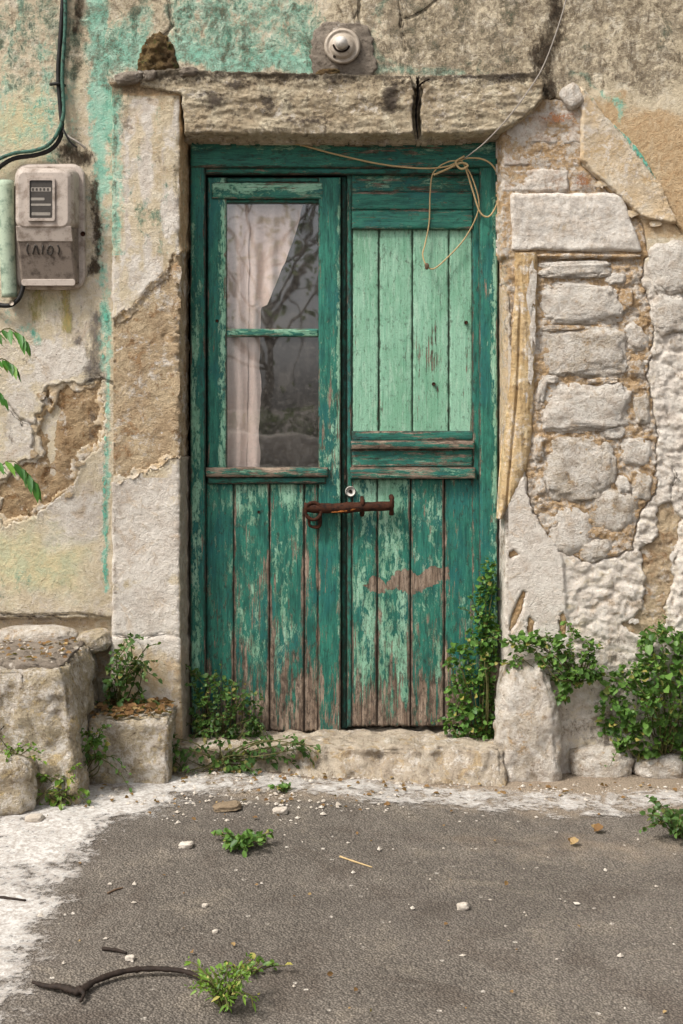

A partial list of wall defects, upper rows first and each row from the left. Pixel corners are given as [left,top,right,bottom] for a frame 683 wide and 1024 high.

crack [415,76,430,139]
flaking render [496,82,676,263]
spalling [0,250,190,527]
spalling [507,591,534,635]
spalling [556,613,566,634]
spalling [622,502,681,638]